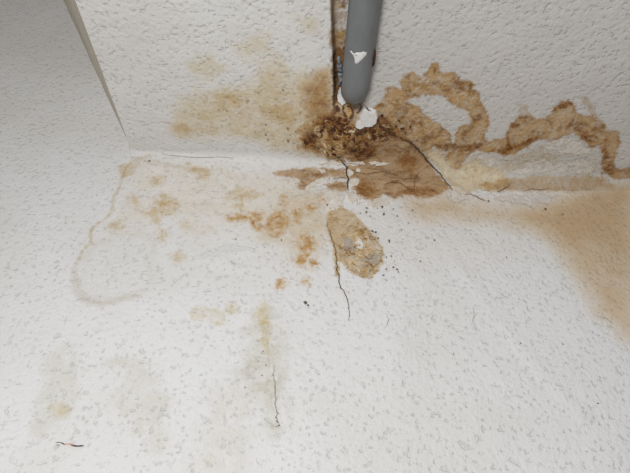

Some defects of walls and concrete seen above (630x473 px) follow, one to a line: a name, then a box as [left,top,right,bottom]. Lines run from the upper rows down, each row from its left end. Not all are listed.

rust [301,47,411,163]
crack [334,126,510,201]
damp [426,144,507,192]
crack [327,222,350,316]